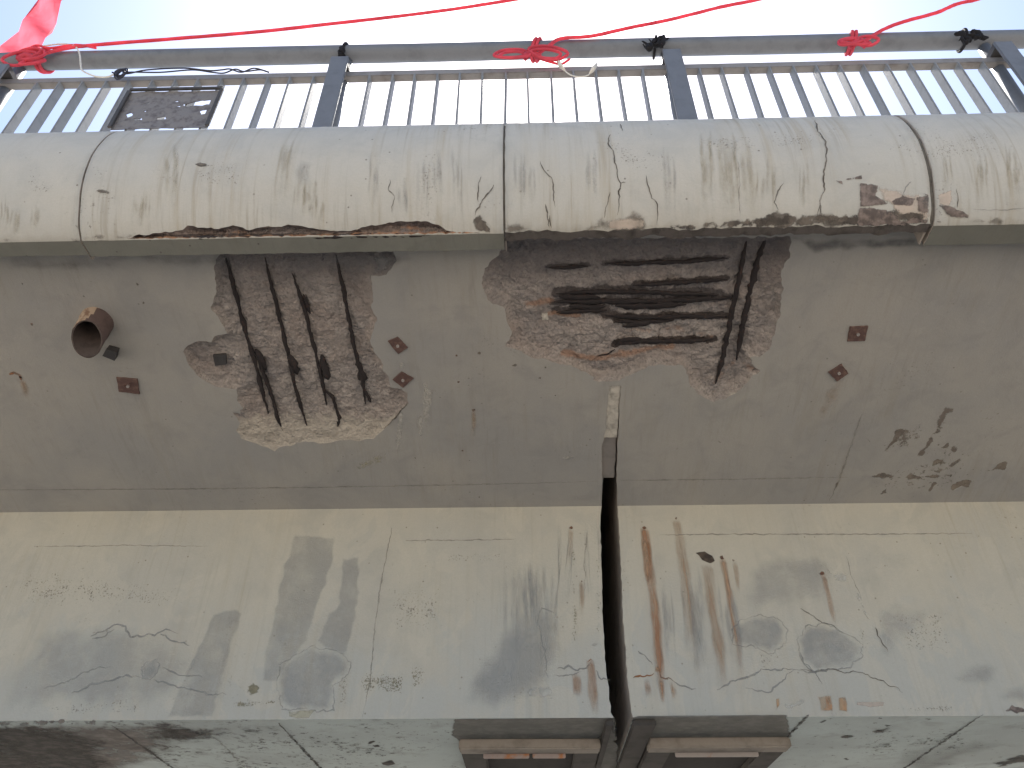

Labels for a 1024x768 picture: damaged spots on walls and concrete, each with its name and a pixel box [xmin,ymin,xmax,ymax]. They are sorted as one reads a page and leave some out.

spalling [129,221,478,239]
crack [604,124,658,220]
crack [815,122,828,214]
peeling [838,176,968,226]
spalling [183,251,409,451]
spalling [482,236,791,402]
crack [96,624,189,646]
leakage [234,683,275,706]
rust [642,526,673,696]
rust [708,585,723,660]
rust [720,555,738,644]
crack [718,653,898,693]